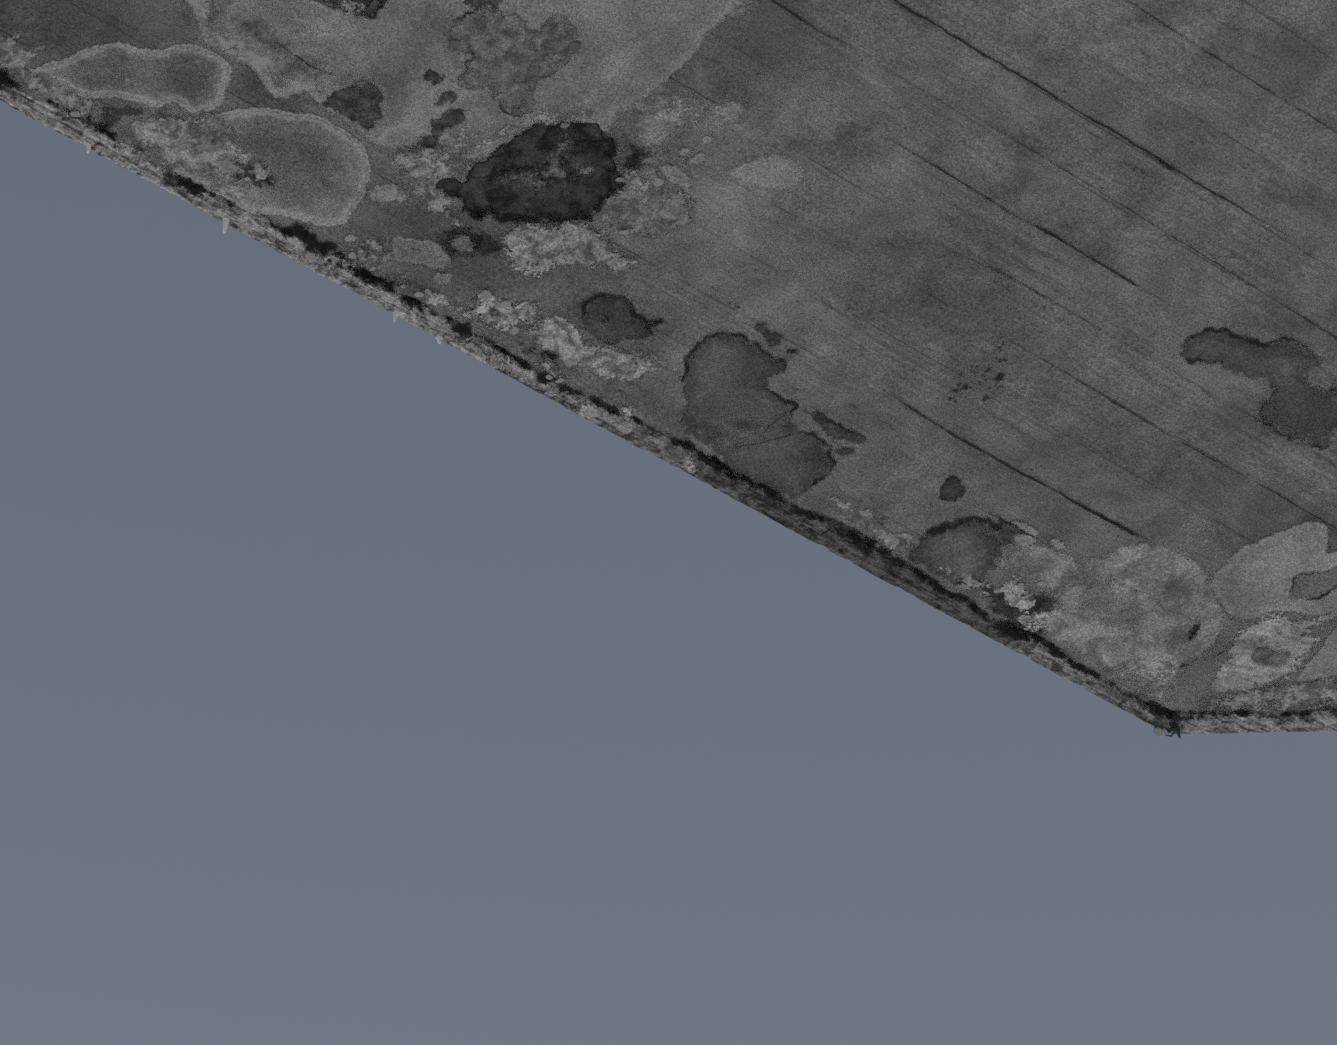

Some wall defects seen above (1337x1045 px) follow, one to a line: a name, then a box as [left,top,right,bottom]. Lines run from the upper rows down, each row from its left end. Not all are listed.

damp [0,0,1337,737]